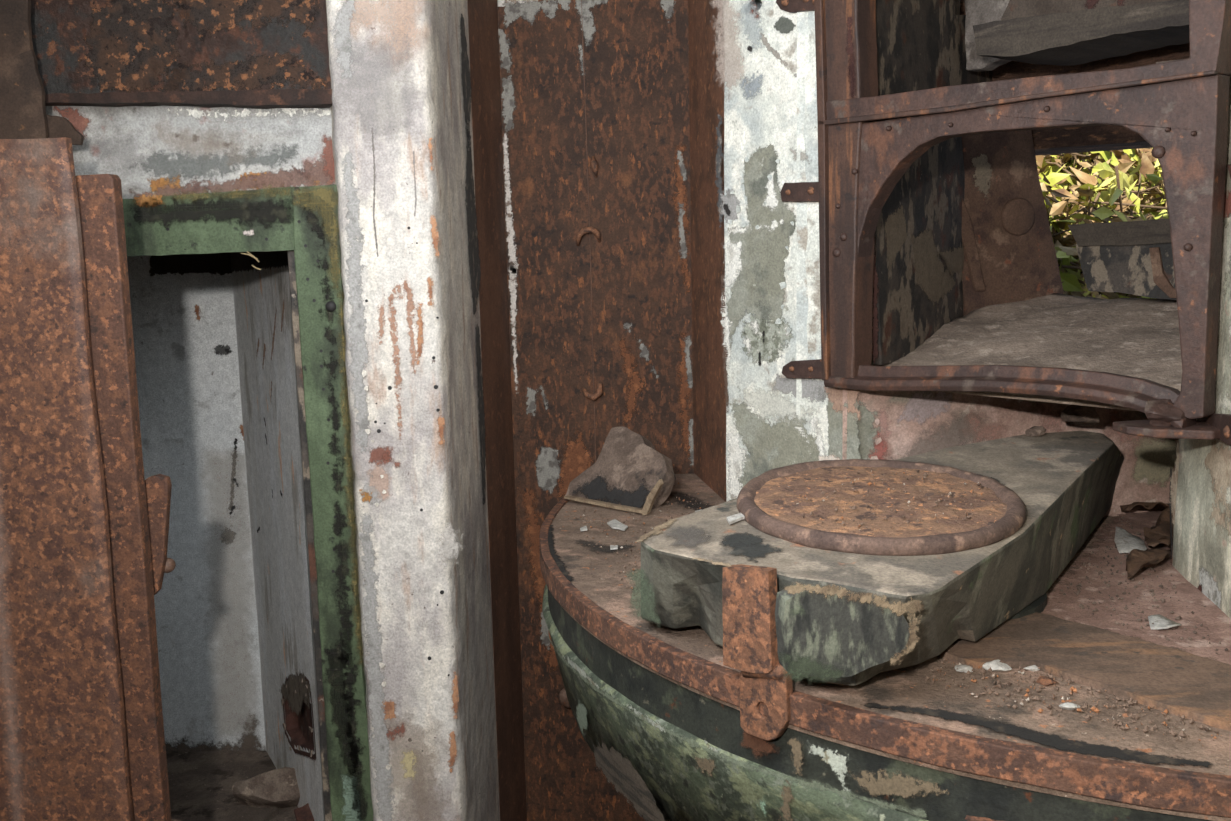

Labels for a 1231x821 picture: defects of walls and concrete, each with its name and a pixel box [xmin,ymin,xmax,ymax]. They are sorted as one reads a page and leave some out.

leakage [713,0,763,99]
peeling [54,106,91,137]
peeling [167,106,331,122]
rust [430,215,440,257]
rust [672,145,691,294]
leakage [720,291,733,368]
rust [369,277,434,499]
rust [618,339,645,425]
rust [556,430,594,497]
leakage [726,433,748,498]
rust [523,489,558,671]